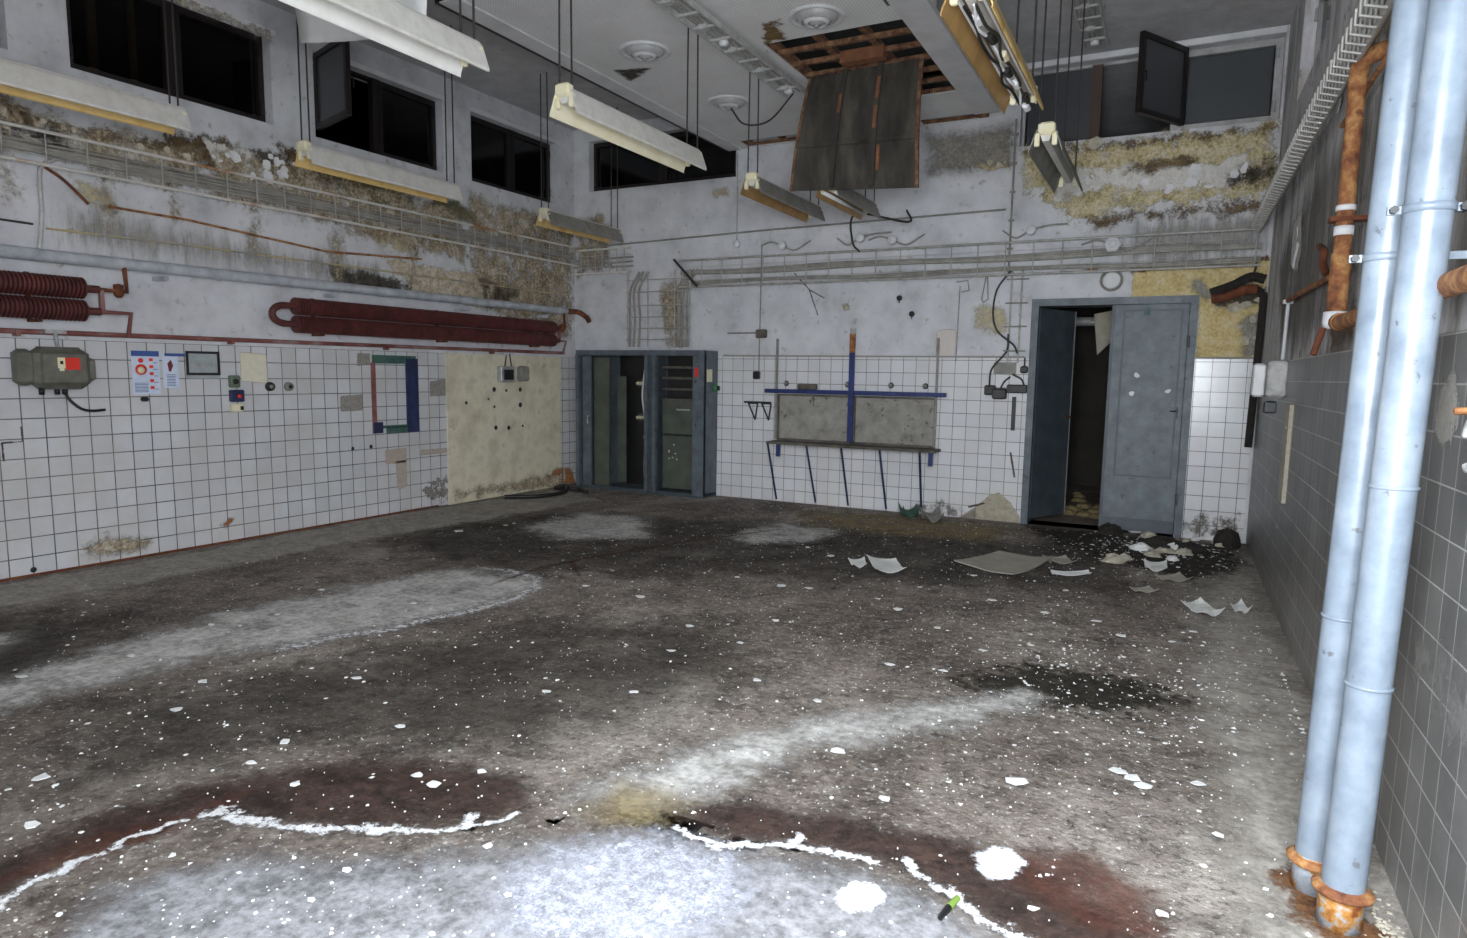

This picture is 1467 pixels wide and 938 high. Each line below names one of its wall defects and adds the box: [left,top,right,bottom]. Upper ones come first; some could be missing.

flaking render [173,0,272,41]
peeling [2,111,295,185]
peeling [975,120,1282,222]
peeling [1192,280,1266,357]
rust [1330,299,1356,352]
rust [1269,868,1392,938]